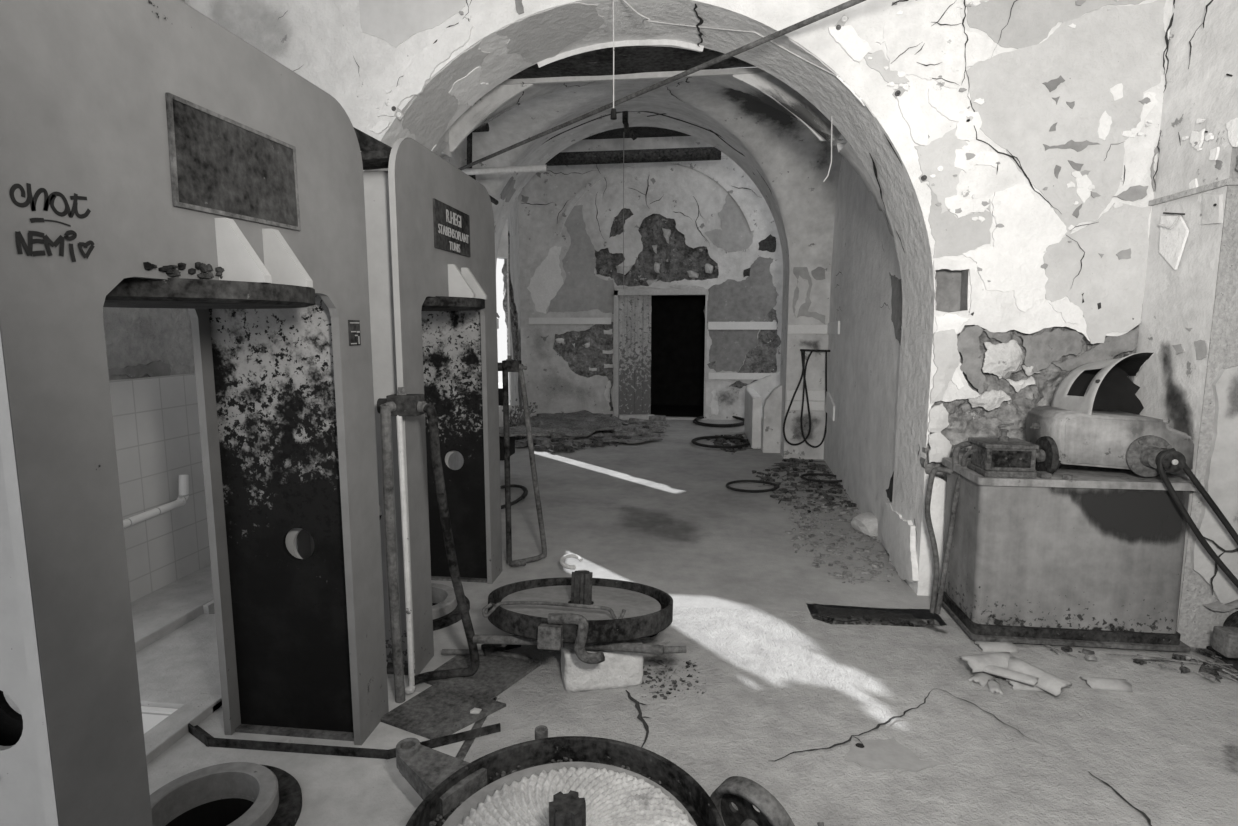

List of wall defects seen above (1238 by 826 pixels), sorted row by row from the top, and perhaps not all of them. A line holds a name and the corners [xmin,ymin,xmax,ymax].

crack [694,4,707,47]
crack [892,0,1098,285]
peeling [1182,117,1238,170]
peeling [500,176,529,203]
peeling [828,0,1166,482]
peeling [496,193,781,422]
peeling [792,267,825,324]
peeling [1172,328,1209,360]
crack [774,688,1039,761]
crack [1089,772,1152,826]